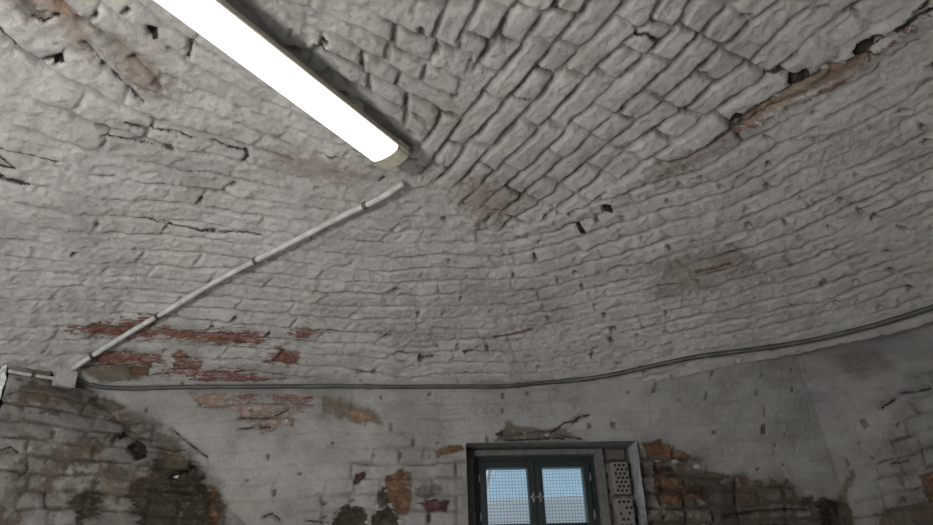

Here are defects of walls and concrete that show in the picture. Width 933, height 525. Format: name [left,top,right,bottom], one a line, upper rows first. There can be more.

spalling [726,7,931,133]
crack [104,121,249,161]
crack [0,147,57,186]
peeling [62,313,301,382]
peeling [287,327,333,341]
peeling [462,328,532,355]
peeling [188,392,314,434]
peeling [332,469,450,525]
peeling [653,460,708,525]